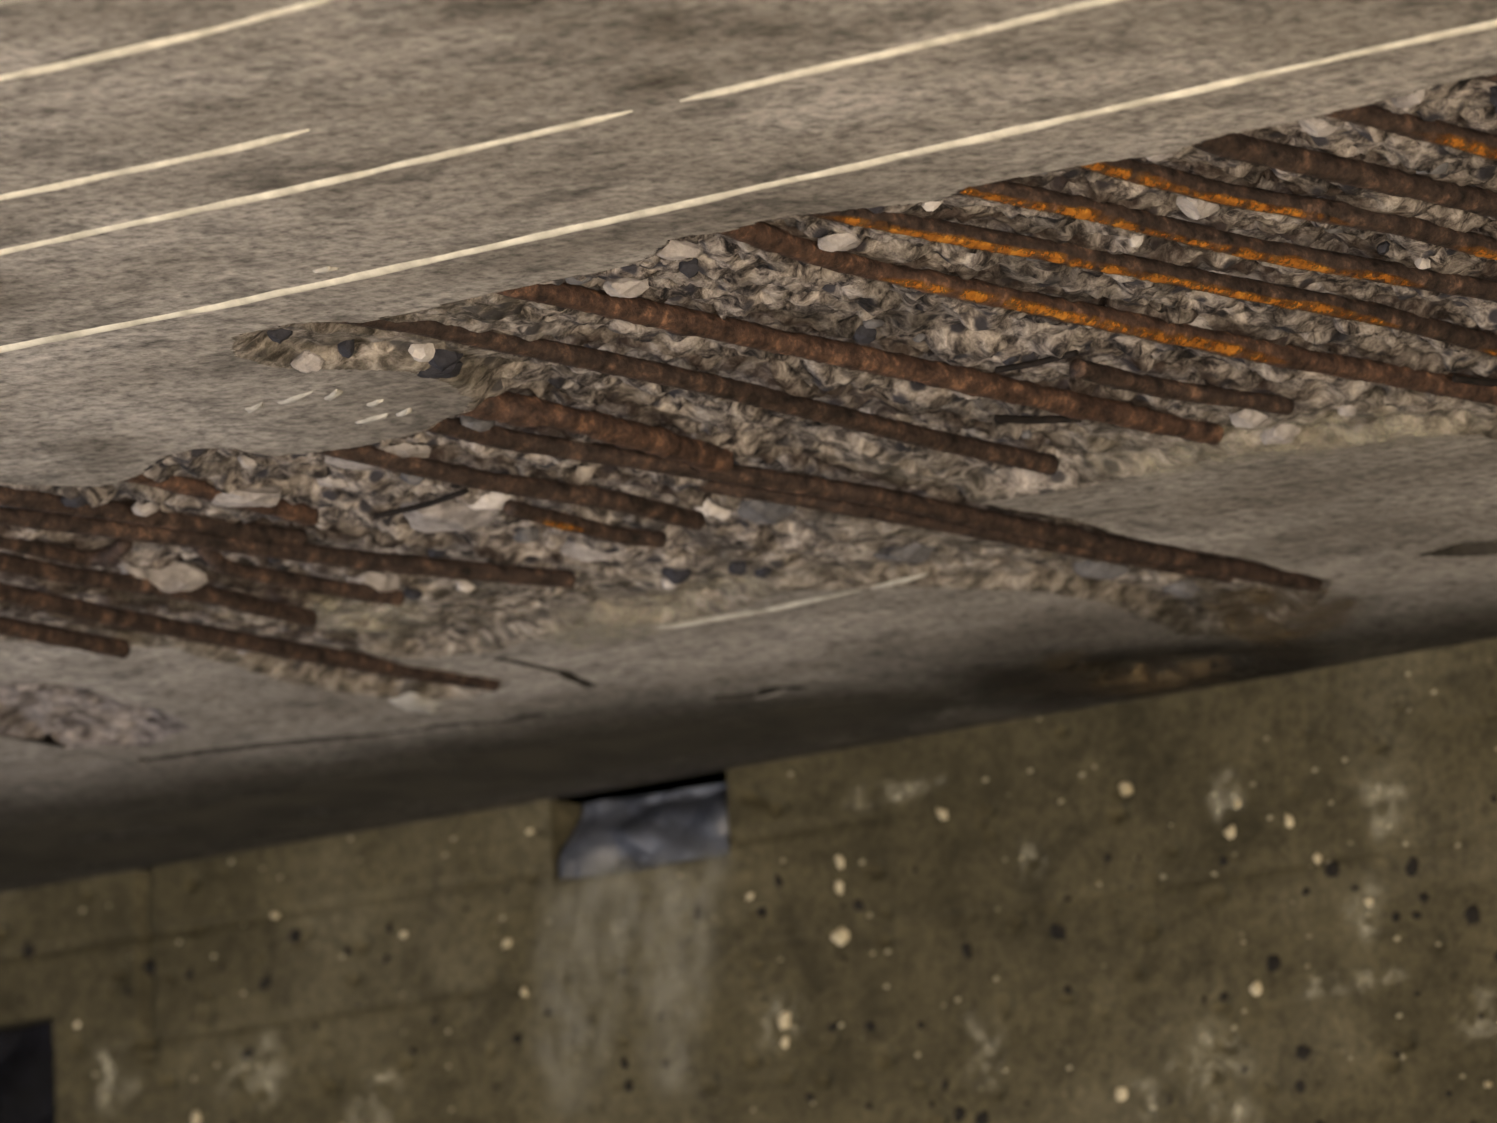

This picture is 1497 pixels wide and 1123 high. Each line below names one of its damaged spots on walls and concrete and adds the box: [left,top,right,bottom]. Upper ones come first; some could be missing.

spalling [0,681,191,748]
spalling [0,74,1497,715]